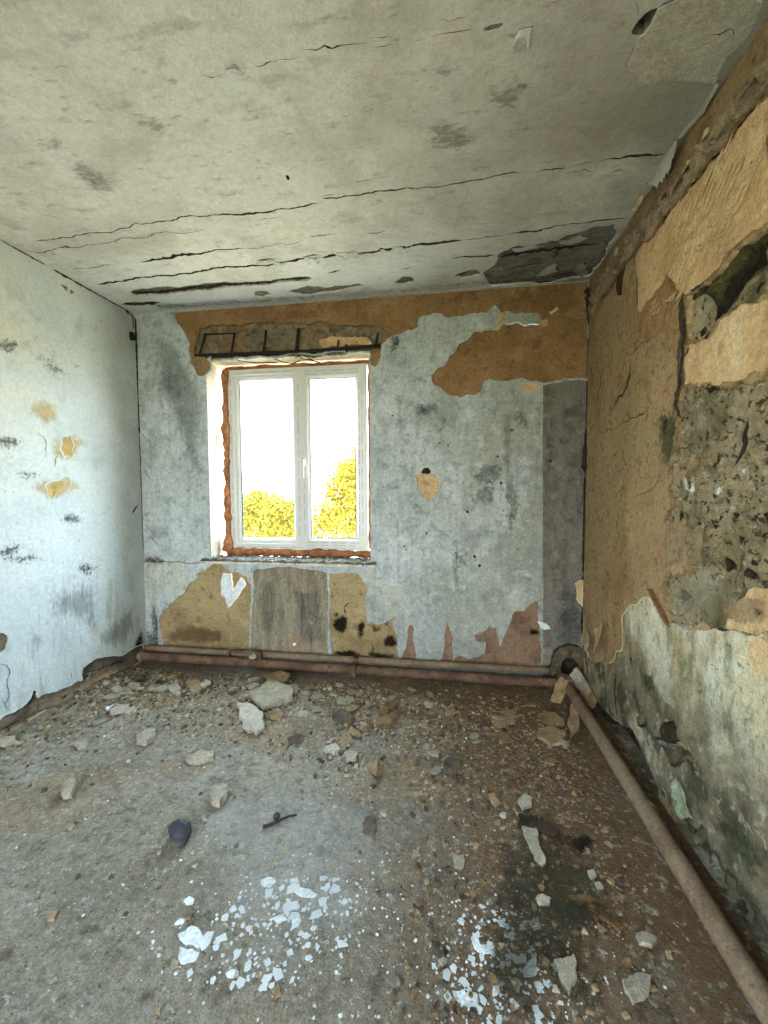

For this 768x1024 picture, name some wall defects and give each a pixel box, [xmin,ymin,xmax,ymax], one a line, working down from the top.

crack [258,17,471,67]
crack [0,153,666,564]
peeling [55,434,75,465]
peeling [44,476,71,502]
peeling [130,18,768,958]